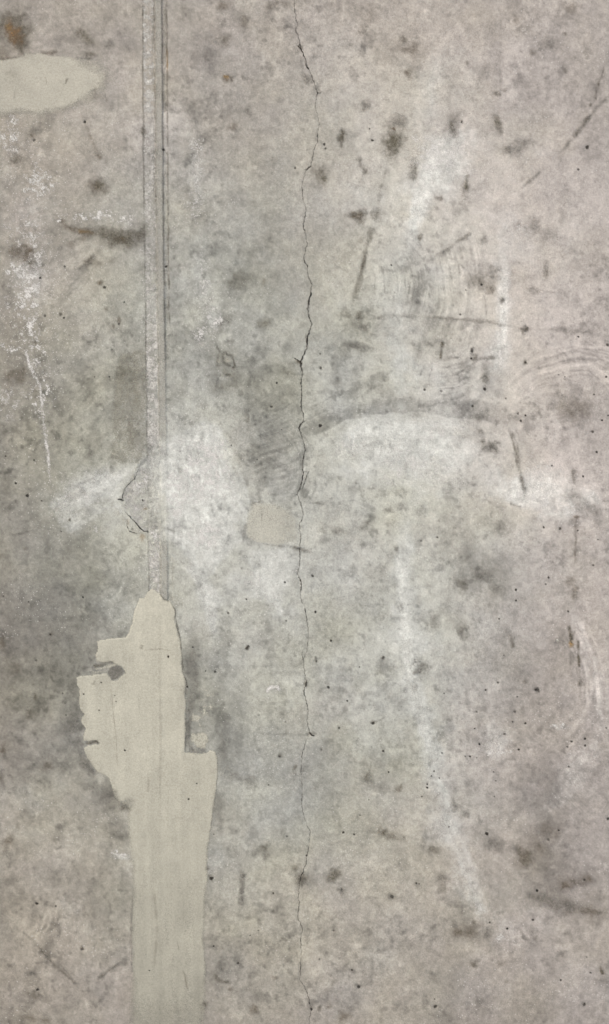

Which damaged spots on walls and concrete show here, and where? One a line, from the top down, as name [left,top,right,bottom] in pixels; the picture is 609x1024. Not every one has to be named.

peeling [190,690,213,749]